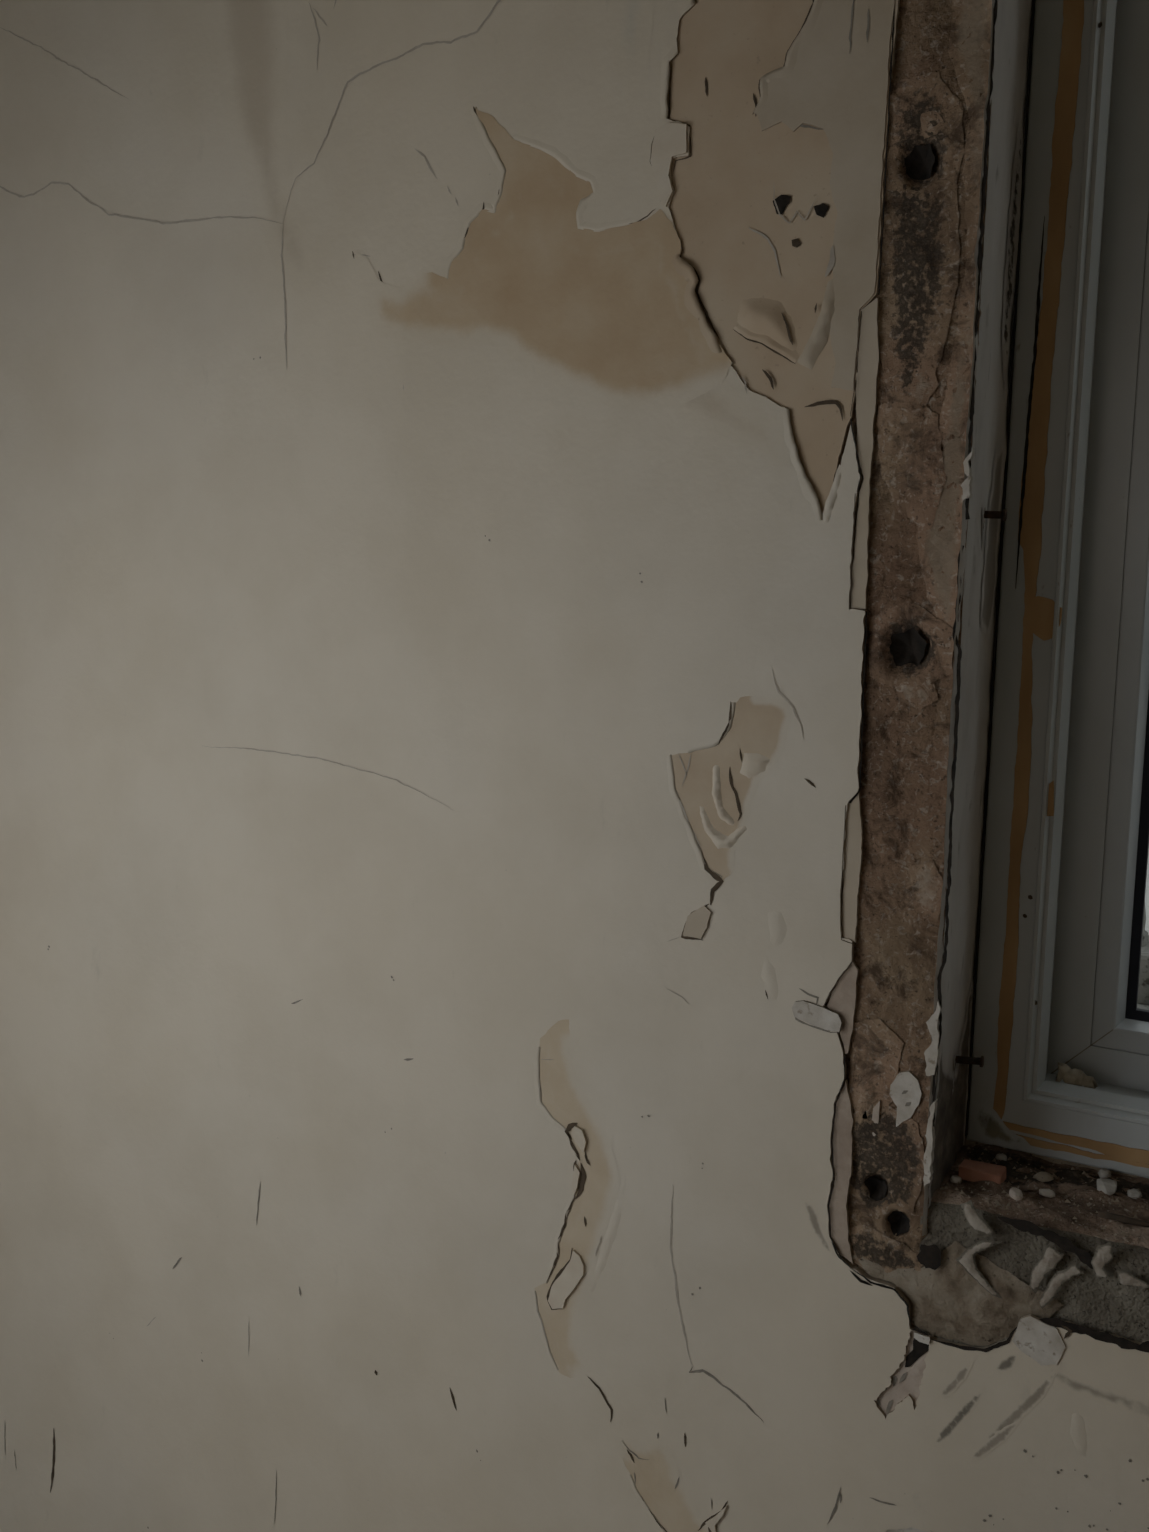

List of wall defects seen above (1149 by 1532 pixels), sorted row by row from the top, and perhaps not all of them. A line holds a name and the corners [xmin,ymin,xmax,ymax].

water stain [352,106,732,411]
peeling [629,0,1063,1417]
peeling [532,1019,728,1532]